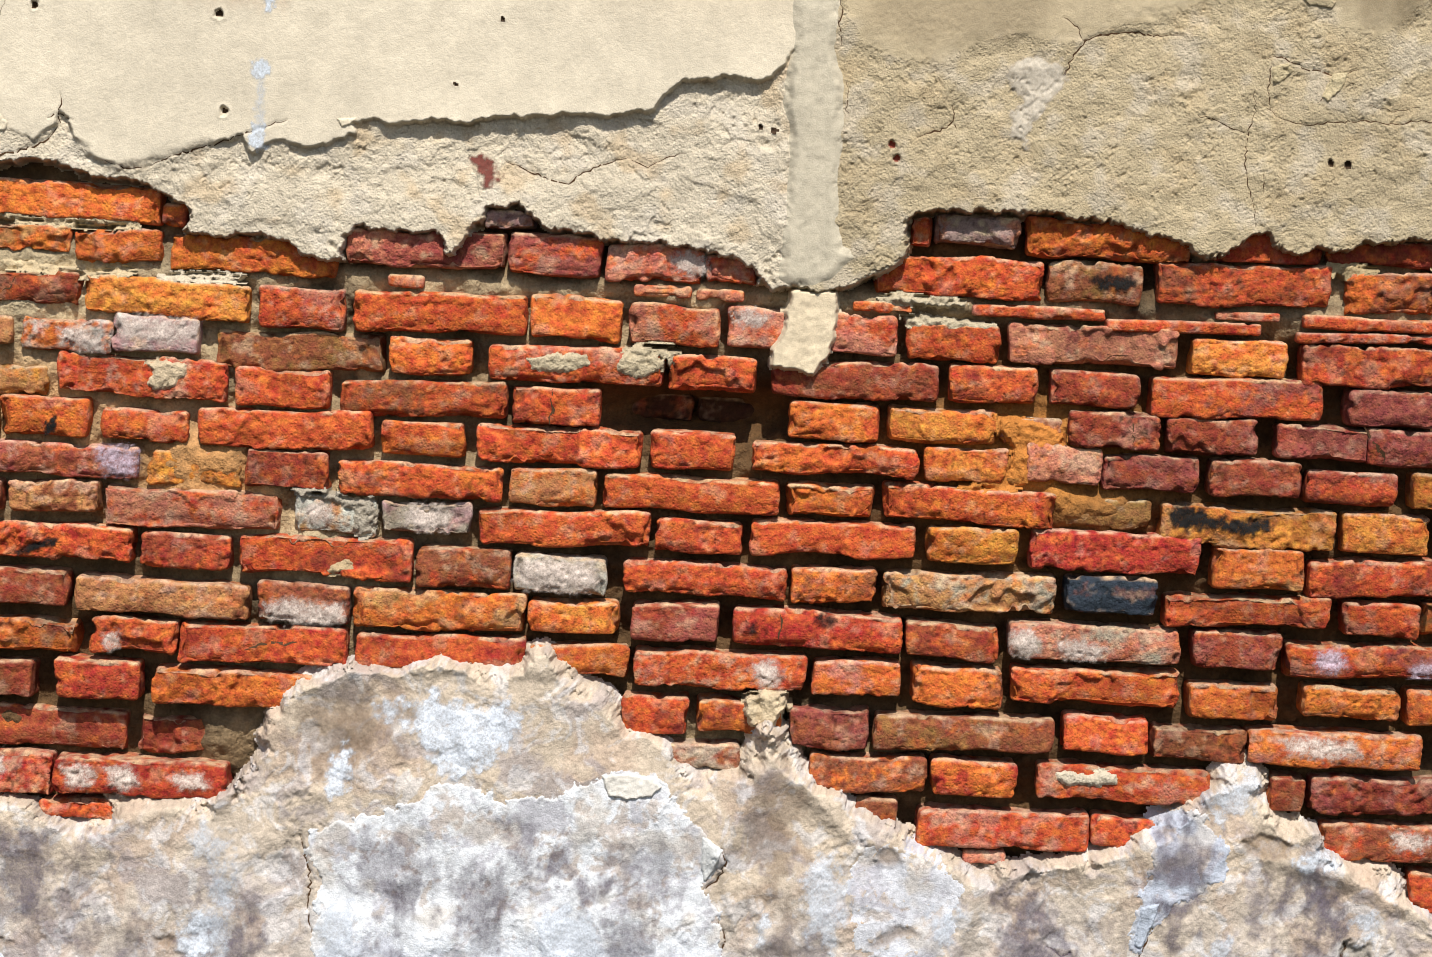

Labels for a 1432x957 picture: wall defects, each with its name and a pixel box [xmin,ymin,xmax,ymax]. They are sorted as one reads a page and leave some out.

crack [1063,18,1168,76]
flaking render [0,0,1432,295]
crack [920,105,957,137]
crack [1198,56,1432,226]
damp [63,763,139,791]
damp [173,773,206,789]
efflorescence [372,686,523,781]
damp [1285,737,1363,760]
damp [178,869,267,957]
peeling [303,770,723,957]
peeling [846,834,965,957]
peeling [1127,805,1231,955]